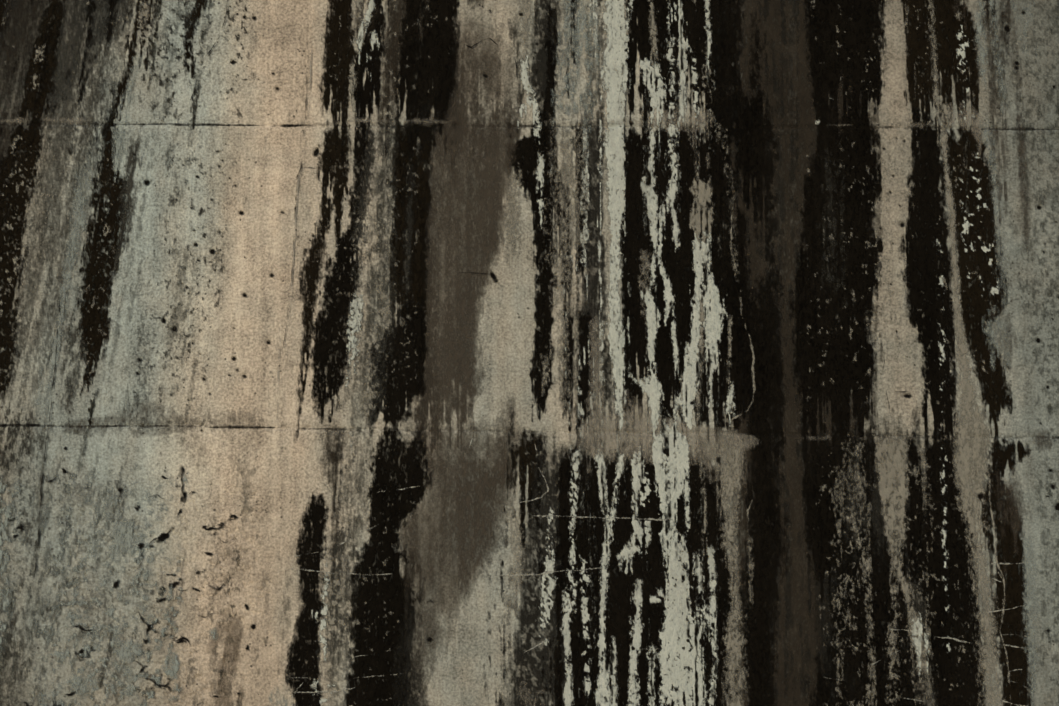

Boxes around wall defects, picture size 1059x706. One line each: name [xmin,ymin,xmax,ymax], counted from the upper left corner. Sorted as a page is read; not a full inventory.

water stain [0,440,45,556]
water stain [0,589,46,680]
water stain [0,0,211,433]
water stain [270,0,1052,706]